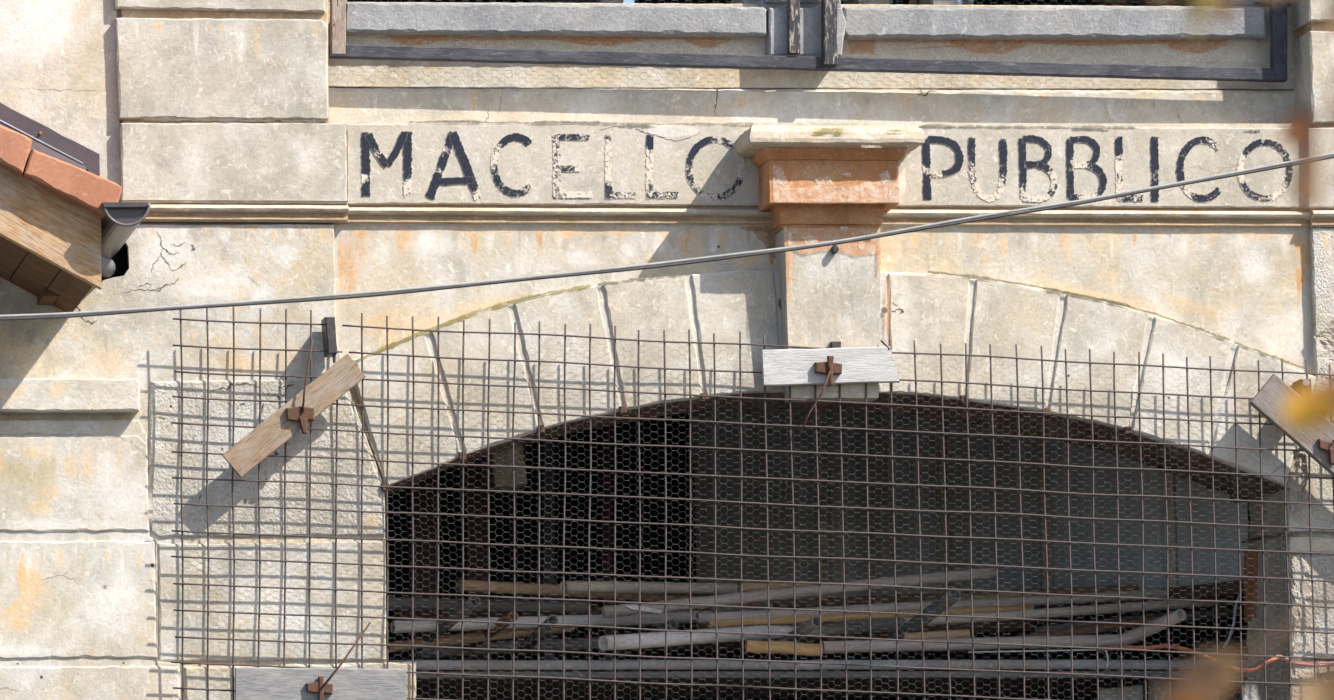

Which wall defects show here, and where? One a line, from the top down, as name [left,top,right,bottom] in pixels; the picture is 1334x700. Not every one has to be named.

crack [123,231,195,294]
spalling [1314,320,1334,385]